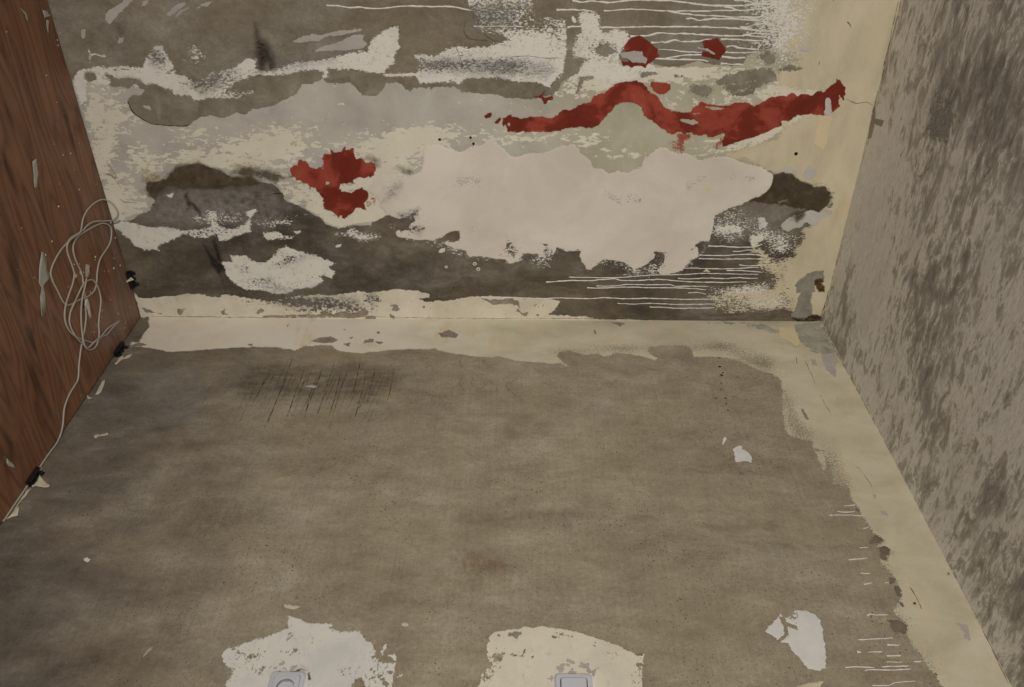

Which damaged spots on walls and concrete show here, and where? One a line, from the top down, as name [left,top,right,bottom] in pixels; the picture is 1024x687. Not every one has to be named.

damp [145,163,292,197]
peeling [72,0,901,321]
damp [750,172,832,222]
peeling [130,288,1012,687]